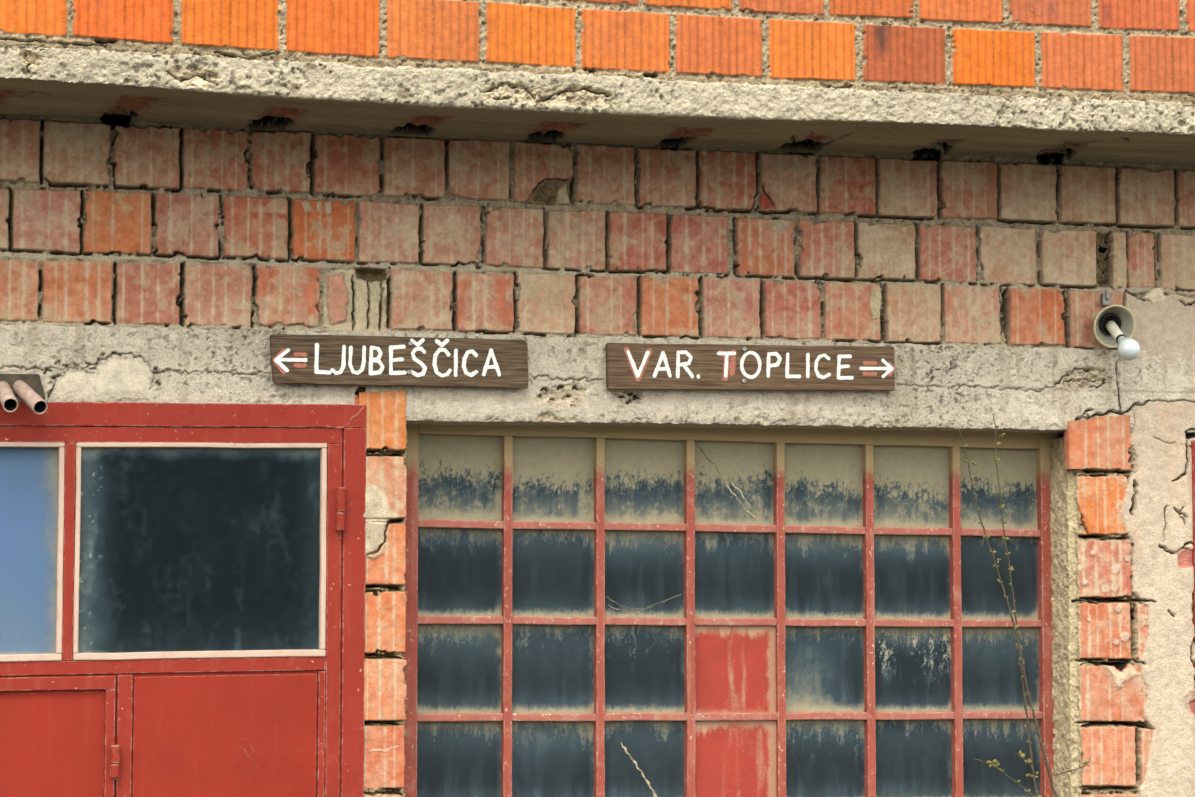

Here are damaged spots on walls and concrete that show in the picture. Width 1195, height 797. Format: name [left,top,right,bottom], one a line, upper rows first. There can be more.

peeling [363,482,403,561]
crack [1073,362,1195,554]